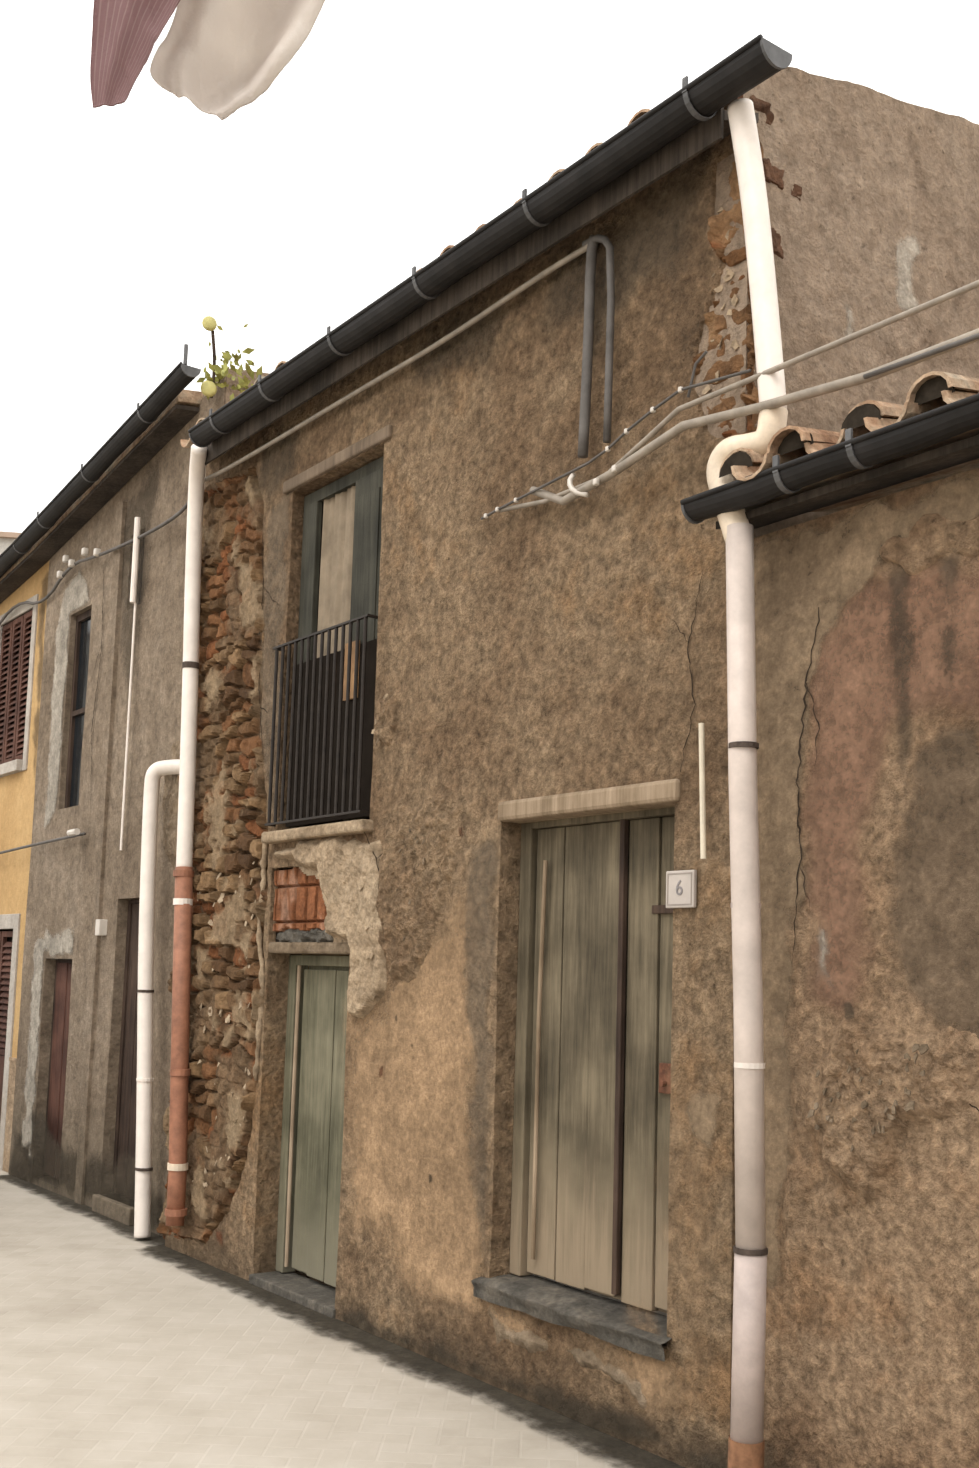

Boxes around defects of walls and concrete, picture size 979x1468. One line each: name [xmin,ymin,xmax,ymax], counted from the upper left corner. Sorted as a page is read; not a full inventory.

spalling [693,161,759,438]
flaking render [737,95,802,201]
flaking render [771,228,784,259]
flaking render [156,466,462,1244]
crack [792,607,820,956]
flaking render [802,1009,979,1216]